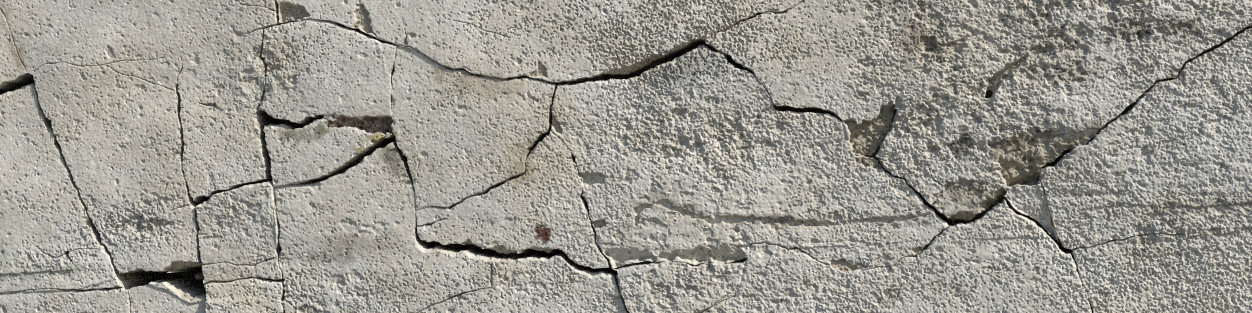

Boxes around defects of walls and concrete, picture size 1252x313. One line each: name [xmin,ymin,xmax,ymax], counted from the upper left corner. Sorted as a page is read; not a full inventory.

crack [0,0,843,313]
spalling [843,104,896,170]
spalling [948,126,1103,224]
crack [854,25,1252,313]